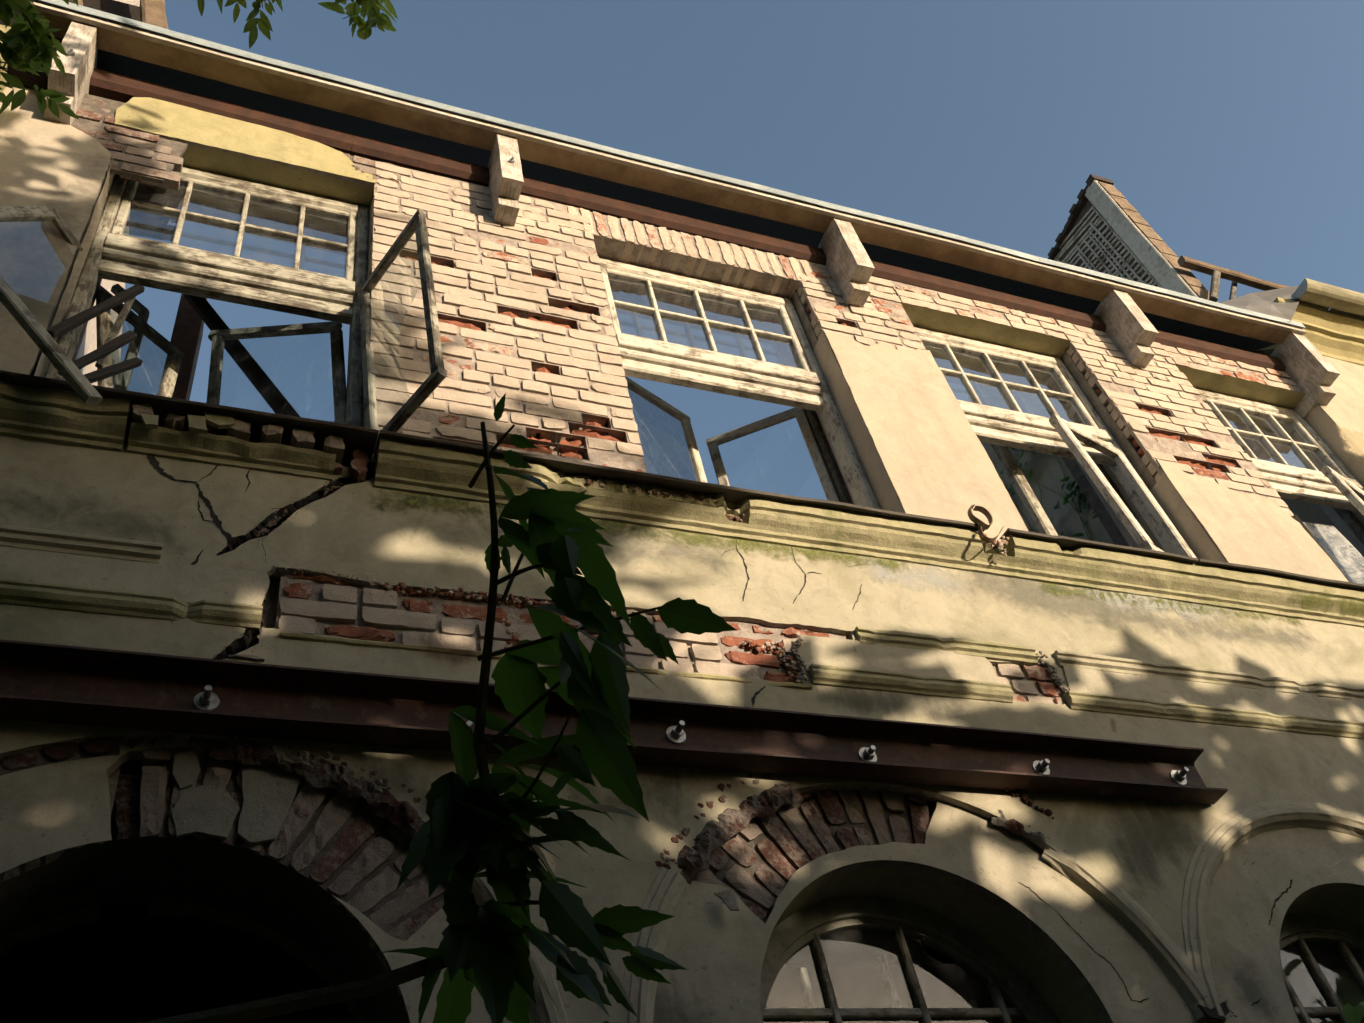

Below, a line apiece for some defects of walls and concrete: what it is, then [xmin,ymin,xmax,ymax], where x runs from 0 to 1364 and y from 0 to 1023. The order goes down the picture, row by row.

flaking render [71,94,188,190]
flaking render [344,153,647,473]
flaking render [796,259,1303,517]
crack [147,455,374,662]
flaking render [273,564,600,654]
flaking render [611,609,850,683]
flaking render [992,651,1069,705]
flaking render [0,734,449,941]
flaking render [655,773,929,920]